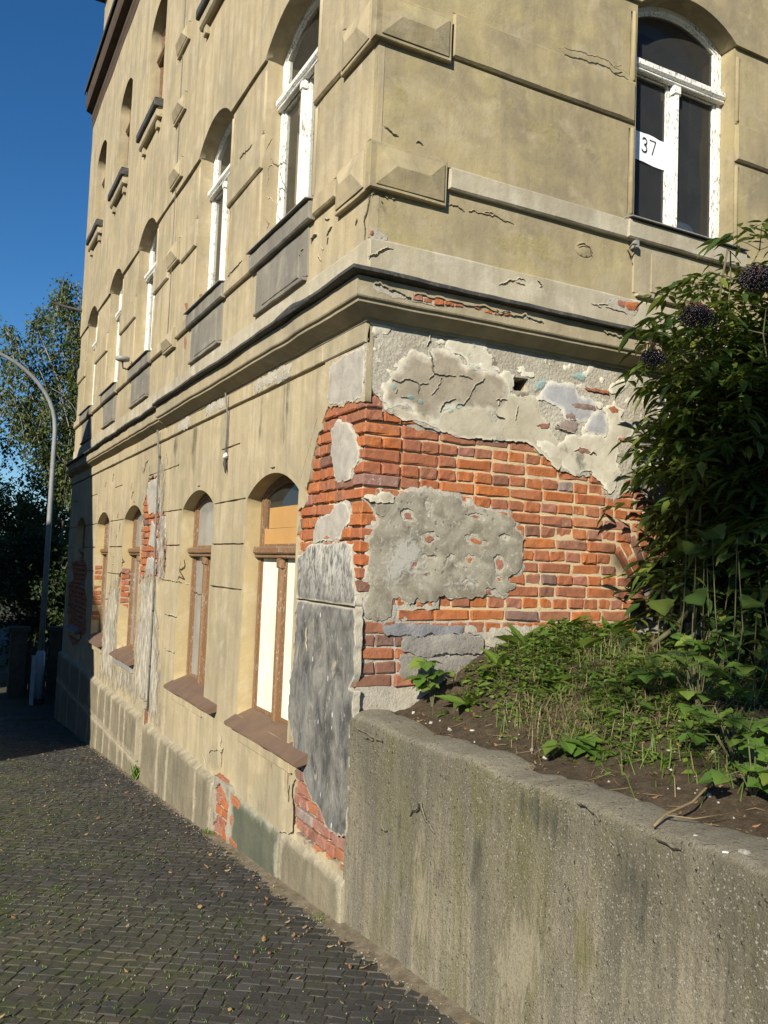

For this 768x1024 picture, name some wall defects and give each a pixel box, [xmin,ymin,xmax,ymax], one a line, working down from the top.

crack [558,47,628,74]
crack [301,192,395,261]
crack [449,203,514,224]
spalling [373,281,543,323]
spalling [607,297,639,316]
peeling [253,363,292,394]
crack [392,333,518,420]
peeling [177,416,190,431]
peeling [205,397,225,416]
peeling [68,464,171,725]
spalling [288,322,689,870]
spalling [211,773,240,849]